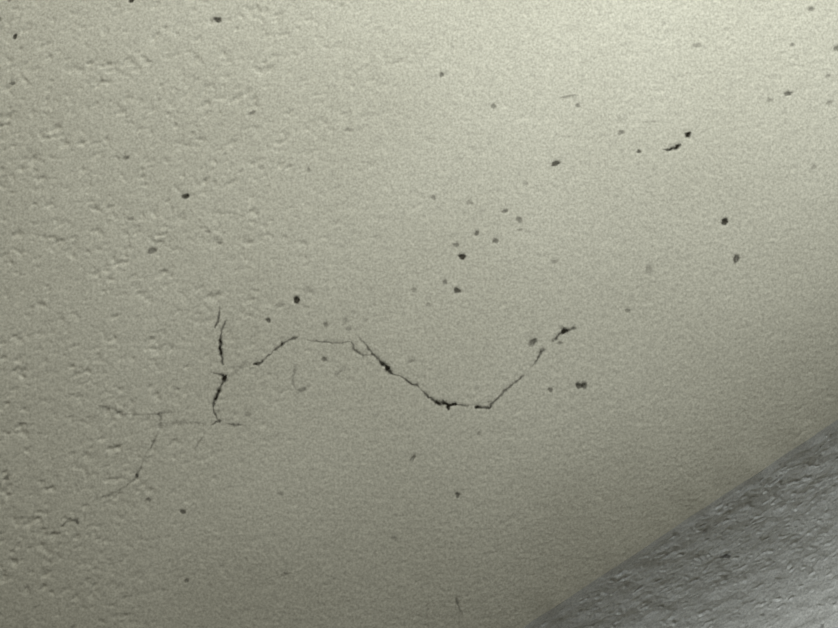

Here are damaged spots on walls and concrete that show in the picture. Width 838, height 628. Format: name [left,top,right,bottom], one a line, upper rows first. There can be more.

crack [213,325,227,422]
crack [372,353,492,410]